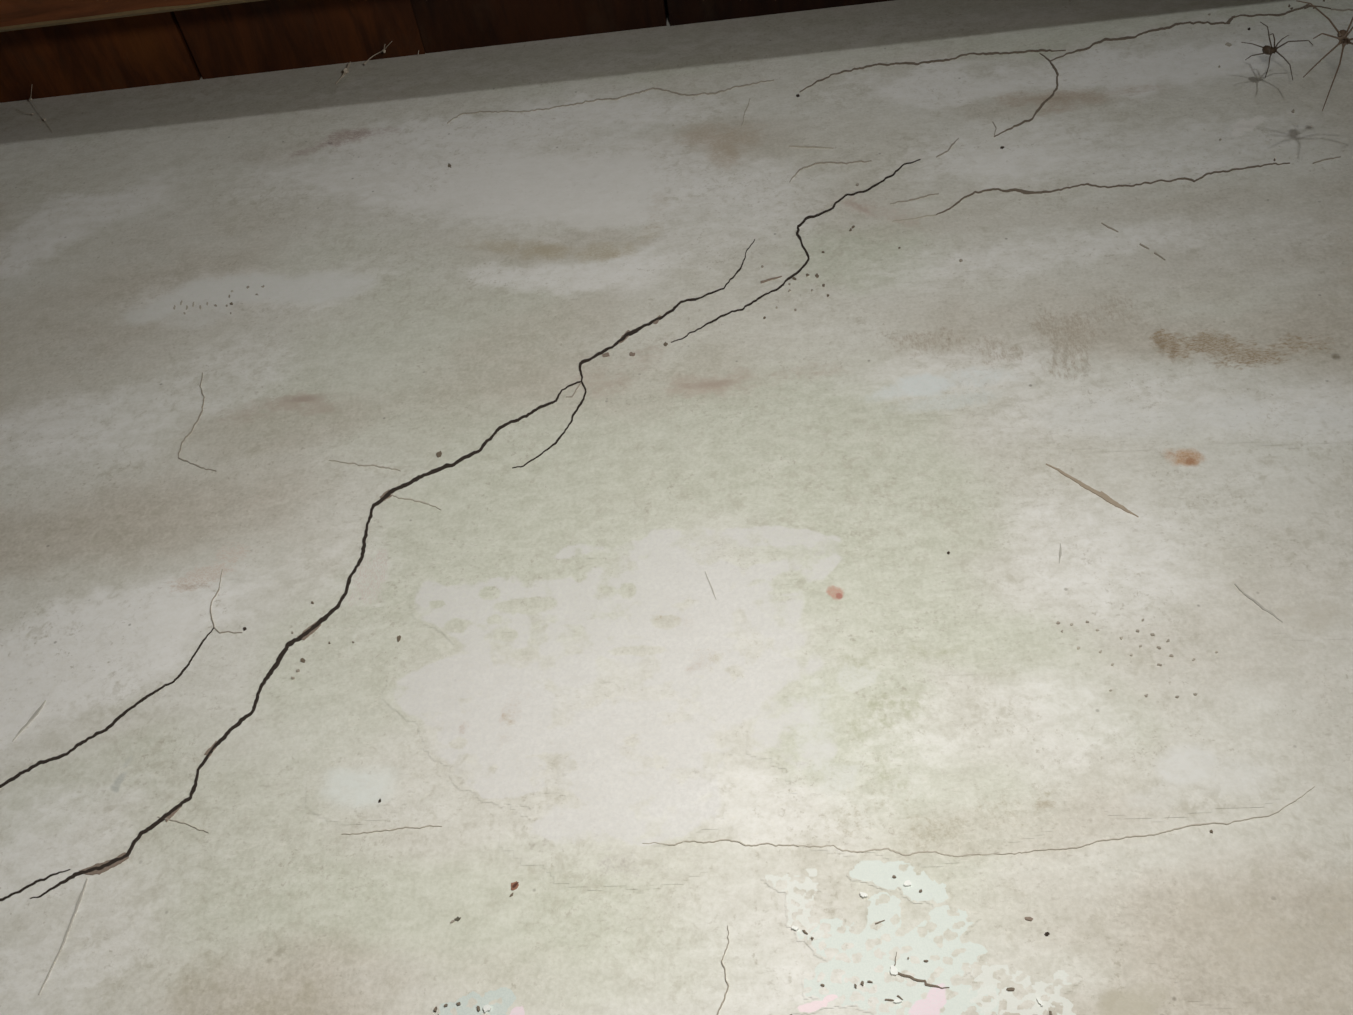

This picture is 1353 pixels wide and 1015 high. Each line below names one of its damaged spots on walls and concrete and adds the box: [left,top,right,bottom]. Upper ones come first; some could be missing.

crack [447,4,1353,137]
crack [0,138,1341,901]
peeling [429,986,526,1015]
crack [717,926,729,1015]
crack [885,952,950,1001]
peeling [761,858,1083,1015]